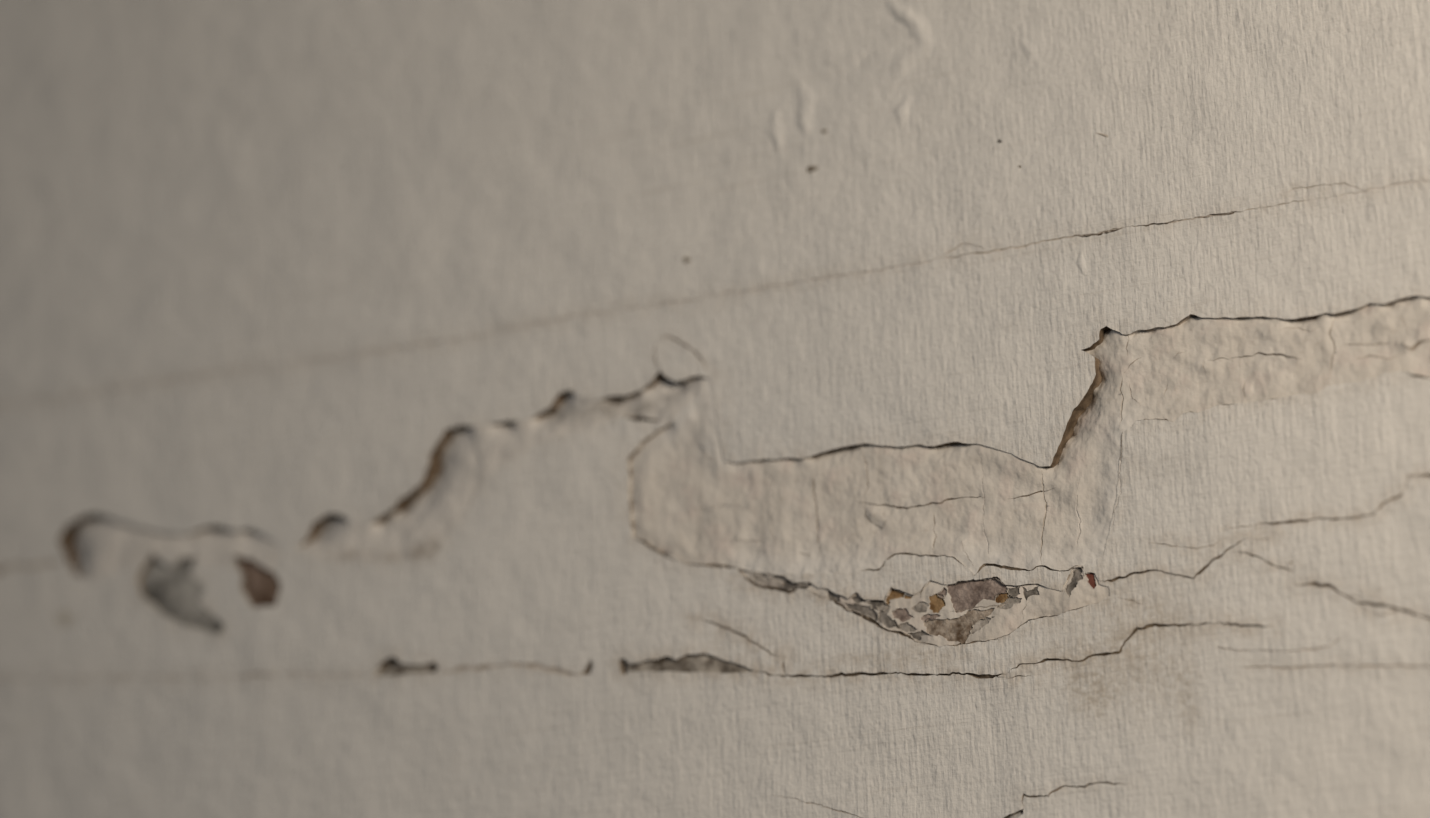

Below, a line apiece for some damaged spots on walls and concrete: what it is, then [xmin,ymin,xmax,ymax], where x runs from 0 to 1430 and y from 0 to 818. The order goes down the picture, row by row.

crack [0,180,1430,405]
peeling [58,295,1430,646]
spalling [375,657,438,676]
spalling [619,653,754,675]
crack [700,474,1430,679]